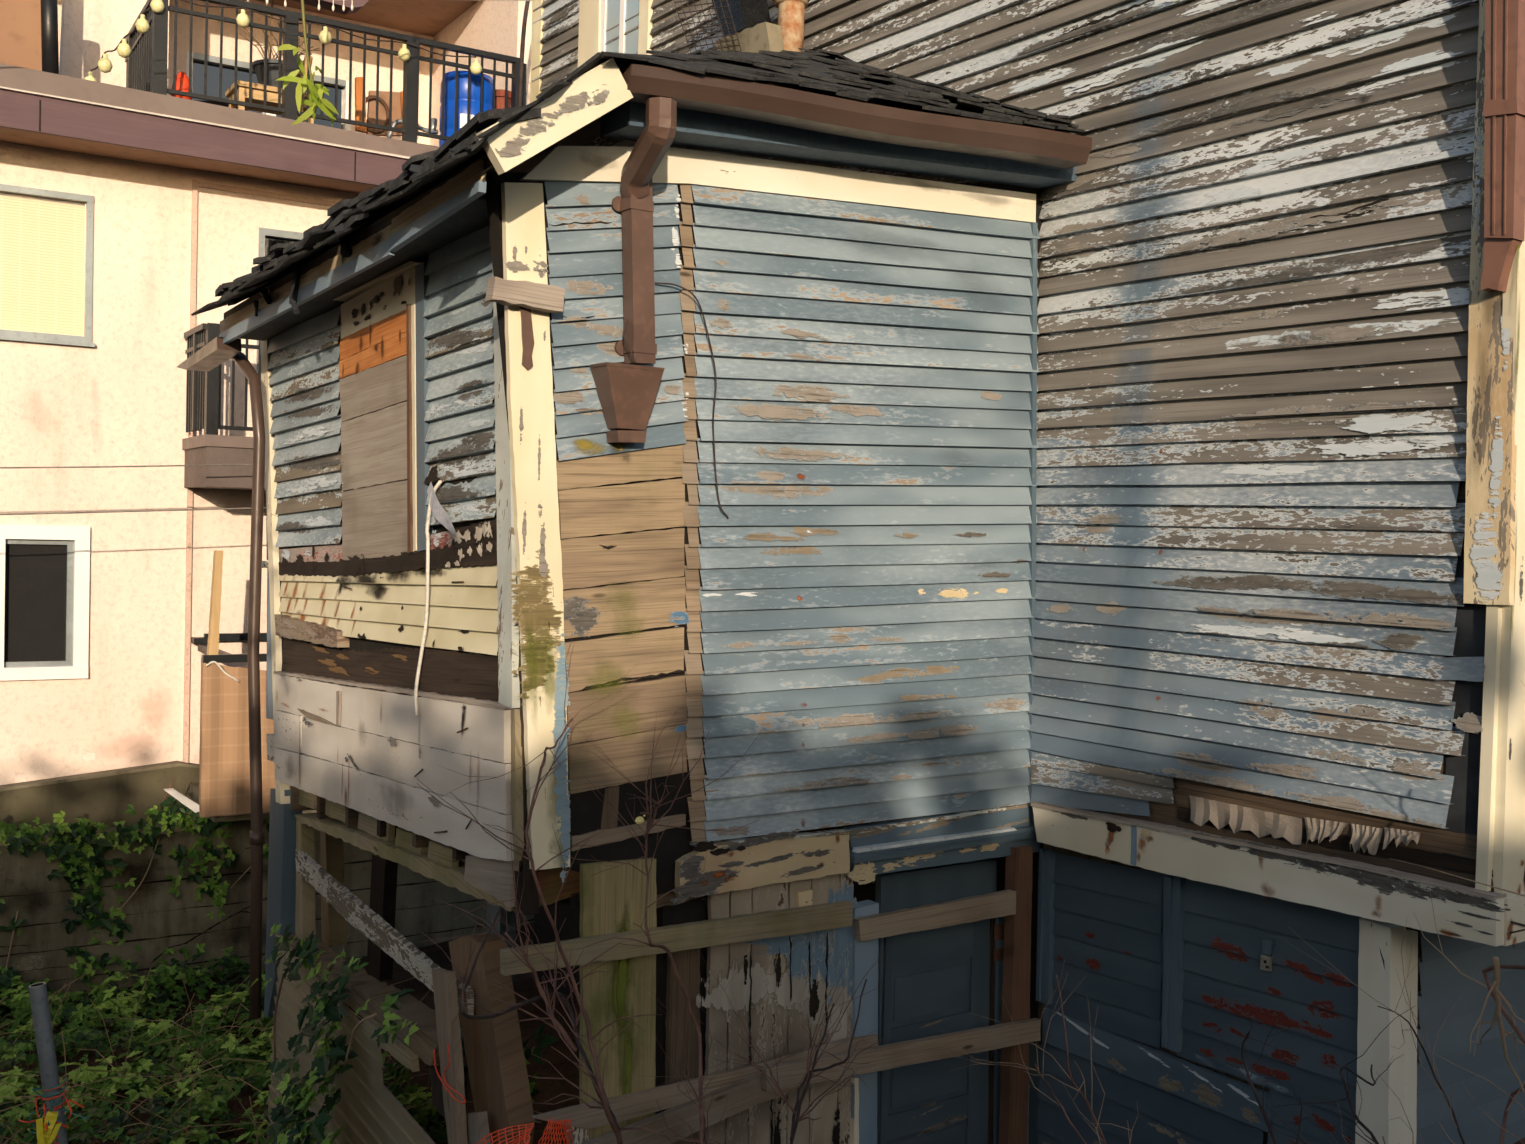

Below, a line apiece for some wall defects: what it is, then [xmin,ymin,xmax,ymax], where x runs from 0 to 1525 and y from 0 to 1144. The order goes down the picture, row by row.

peeling [1001,0,1477,195]
peeling [1159,110,1482,296]
peeling [1165,286,1469,352]
peeling [424,379,496,568]
peeling [700,446,855,499]
peeling [1219,401,1467,477]
peeling [1153,416,1523,656]
peeling [918,559,1029,598]
peeling [1451,712,1483,735]
peeling [1153,746,1445,829]
peeling [670,826,831,904]
peeling [696,803,1030,1043]